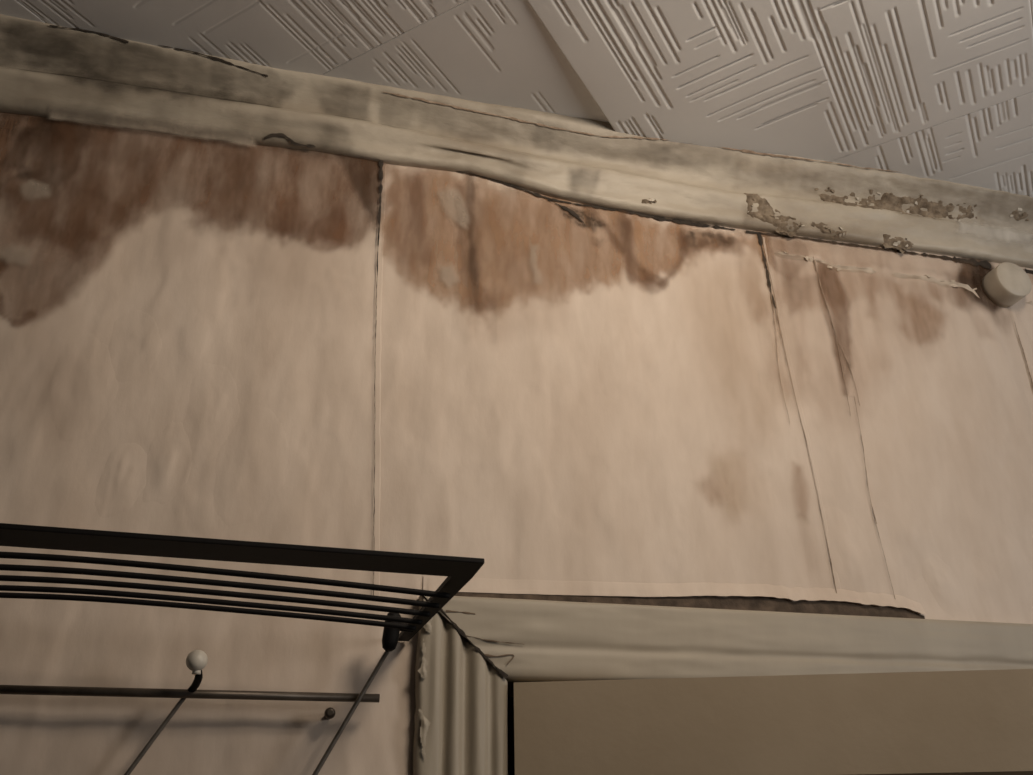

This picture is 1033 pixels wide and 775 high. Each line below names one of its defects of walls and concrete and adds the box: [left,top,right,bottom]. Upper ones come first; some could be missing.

damp [0,109,380,268]
spalling [743,193,847,238]
spalling [813,187,977,222]
damp [384,174,732,308]
spalling [883,234,914,254]